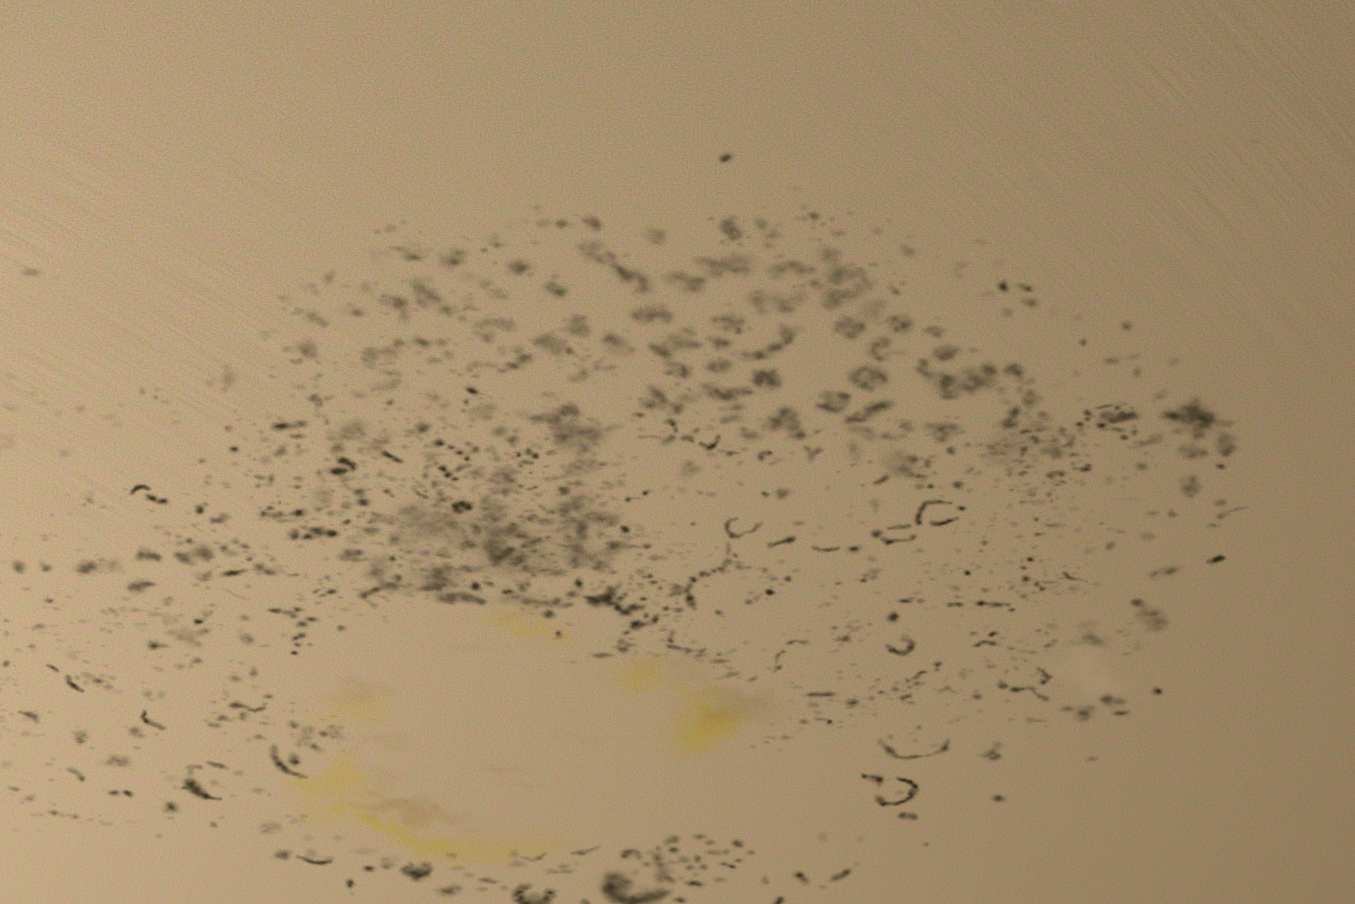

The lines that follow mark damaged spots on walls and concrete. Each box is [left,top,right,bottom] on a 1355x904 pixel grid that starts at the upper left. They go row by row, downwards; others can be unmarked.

damp [331,458,354,474]
damp [132,486,166,503]
damp [916,486,964,526]
damp [292,521,349,539]
damp [576,581,667,634]
damp [184,781,214,799]
damp [879,779,917,818]
damp [607,883,658,904]